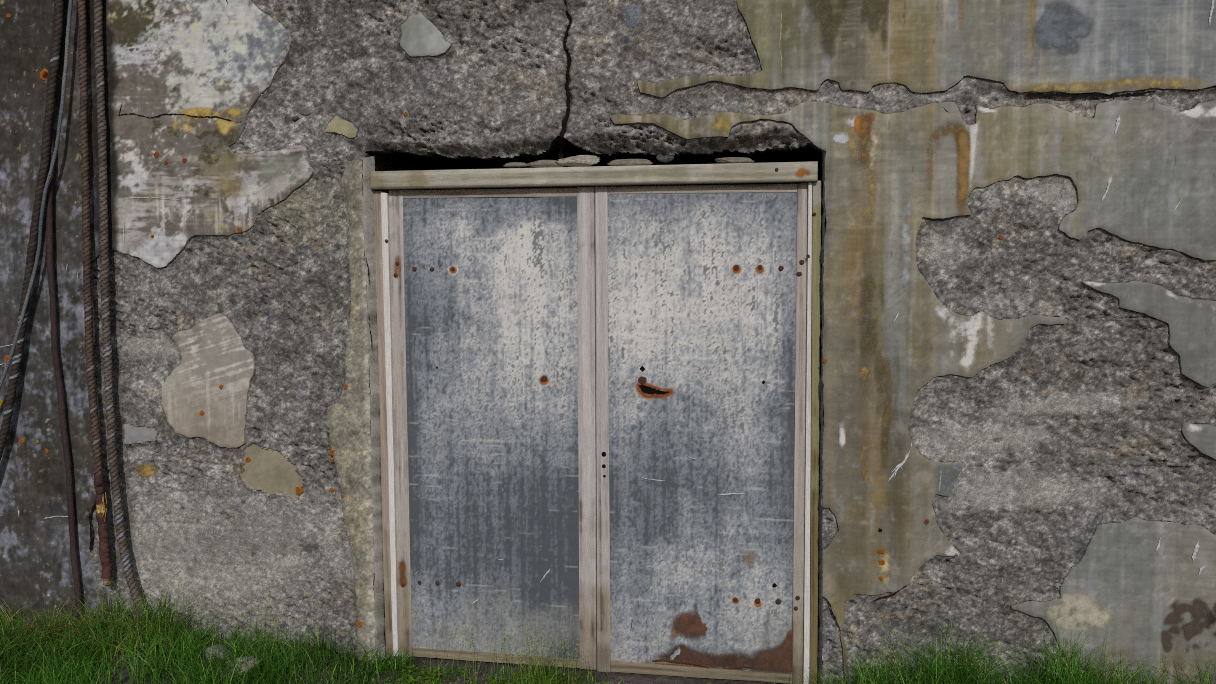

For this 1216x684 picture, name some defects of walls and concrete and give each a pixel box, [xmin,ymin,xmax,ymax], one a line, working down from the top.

damp [862,0,889,41]
crack [116,105,232,121]
crack [558,0,572,159]
spalling [665,76,1216,125]
crack [1026,90,1156,98]
efflorescence [1181,105,1216,118]
corrosion [849,114,875,217]
corrosion [933,123,970,208]
spalling [109,0,762,657]
spalling [822,174,1216,684]
corrosion [661,613,793,674]
damp [1162,599,1216,652]